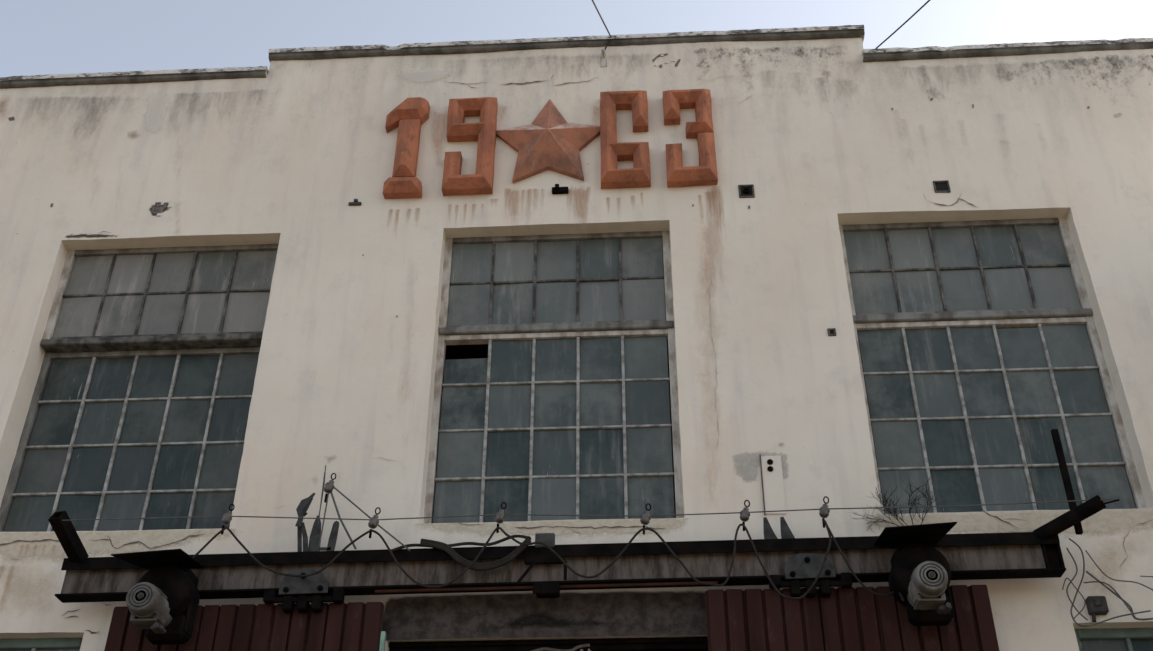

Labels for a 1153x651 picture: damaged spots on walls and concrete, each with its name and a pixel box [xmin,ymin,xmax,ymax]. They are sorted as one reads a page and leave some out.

spalling [150,202,172,216]
crack [91,534,202,549]
crack [0,539,59,560]